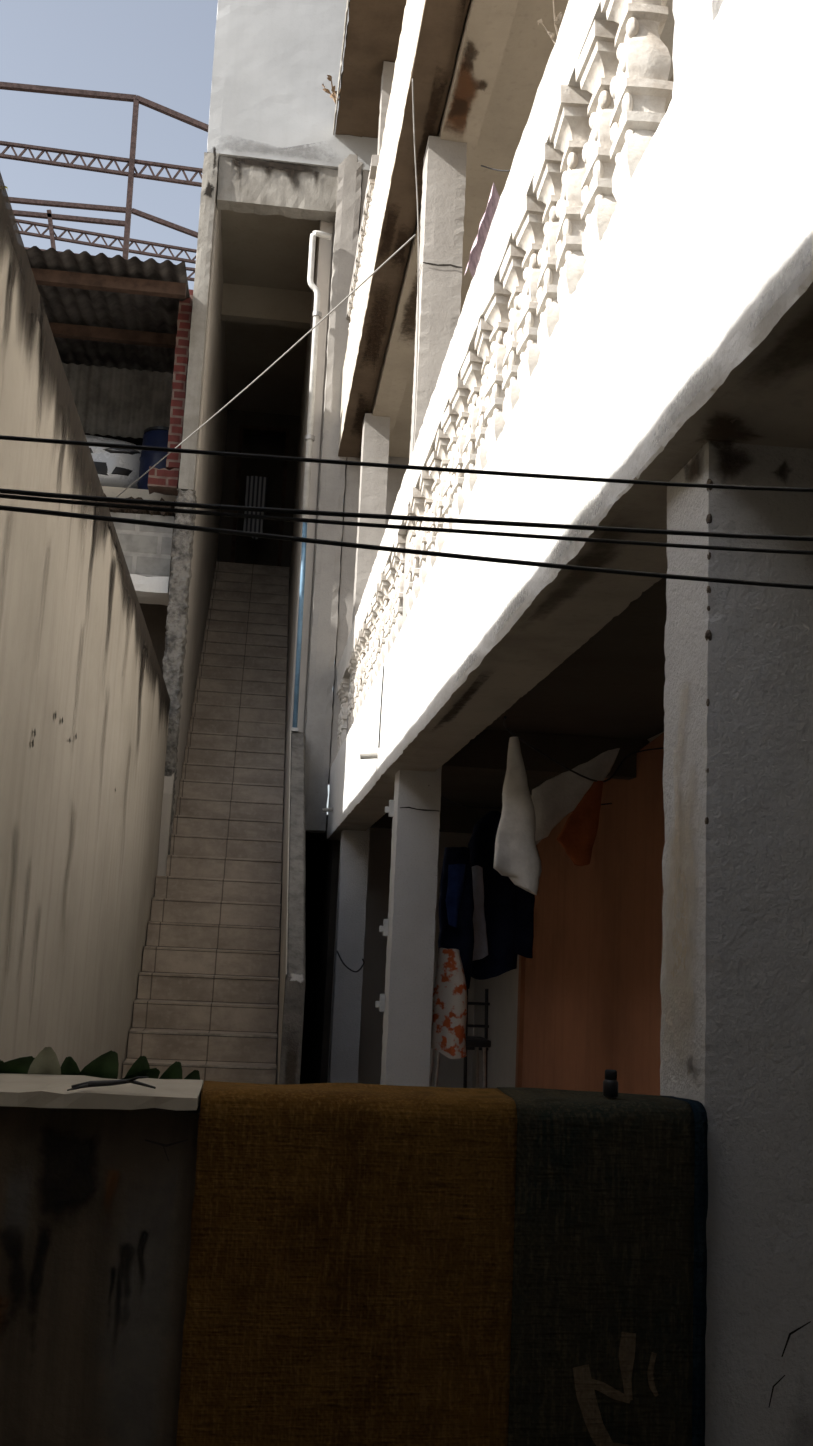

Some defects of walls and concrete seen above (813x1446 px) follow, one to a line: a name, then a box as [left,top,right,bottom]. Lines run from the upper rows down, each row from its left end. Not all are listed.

leakage [439,676,487,724]